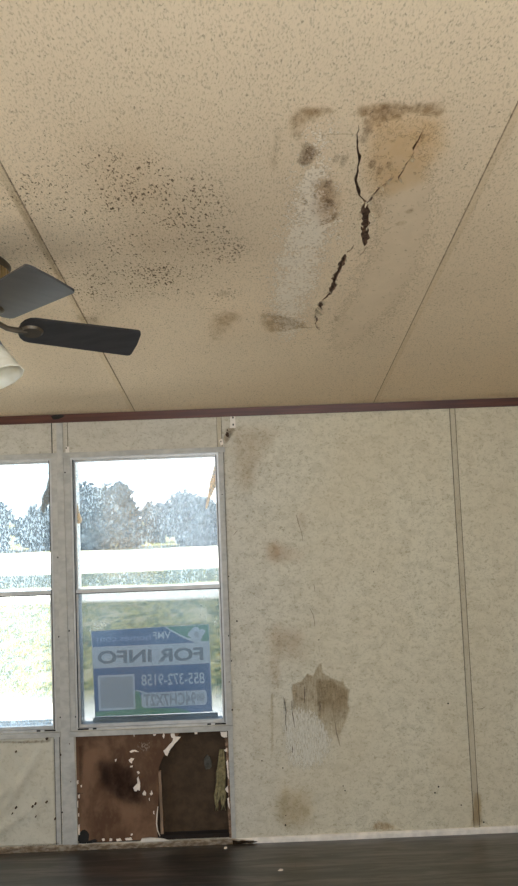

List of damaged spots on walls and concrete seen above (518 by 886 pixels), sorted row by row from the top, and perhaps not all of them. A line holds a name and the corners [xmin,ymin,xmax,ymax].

crack [314,125,426,330]
damp [280,687,340,771]
spalling [129,731,258,844]